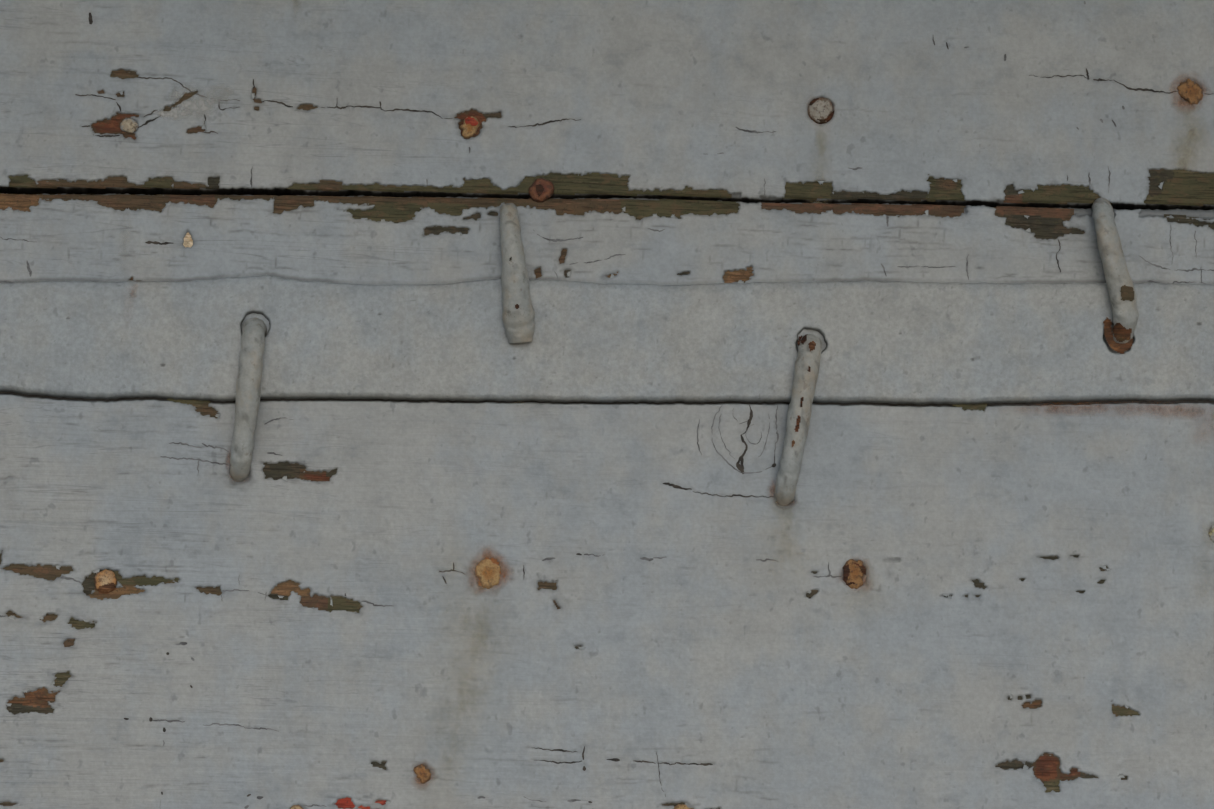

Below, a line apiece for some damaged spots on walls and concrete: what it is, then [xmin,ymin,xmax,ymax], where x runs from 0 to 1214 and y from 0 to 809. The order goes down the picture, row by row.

crack [75,94,161,137]
crack [137,77,452,134]
crack [1004,54,1213,130]
peeling [0,172,740,235]
peeling [761,174,966,219]
peeling [993,184,1112,240]
corrosion [1103,317,1133,354]
crack [663,403,779,498]
peeling [0,550,179,600]
corrosion [474,553,507,588]
corrosion [843,562,866,585]
peeling [995,753,1098,793]